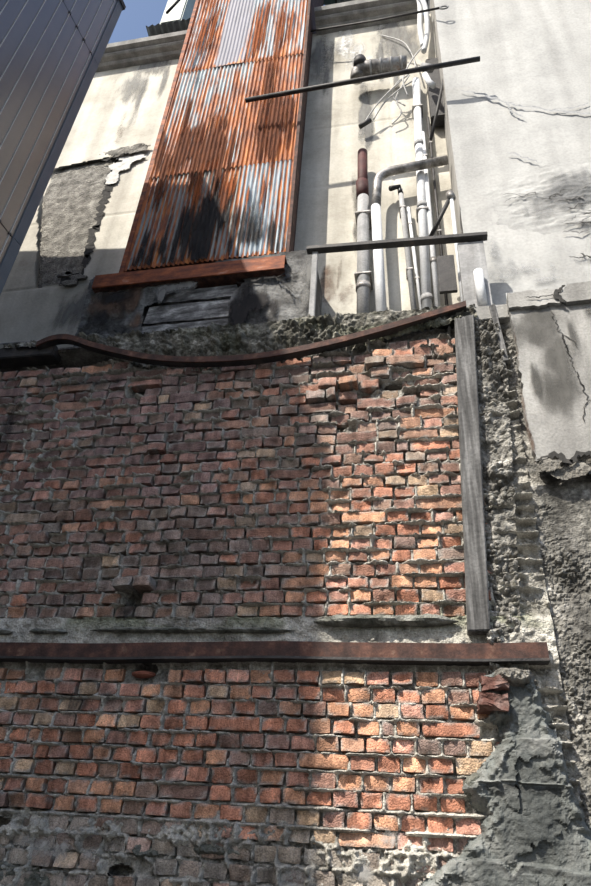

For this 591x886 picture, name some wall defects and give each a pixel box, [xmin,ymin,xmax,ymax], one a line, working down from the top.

rust [148,0,298,219]
spalling [38,143,151,288]
crack [527,285,590,422]
spalling [524,451,591,480]
spalling [476,674,510,714]
spalling [108,863,133,876]